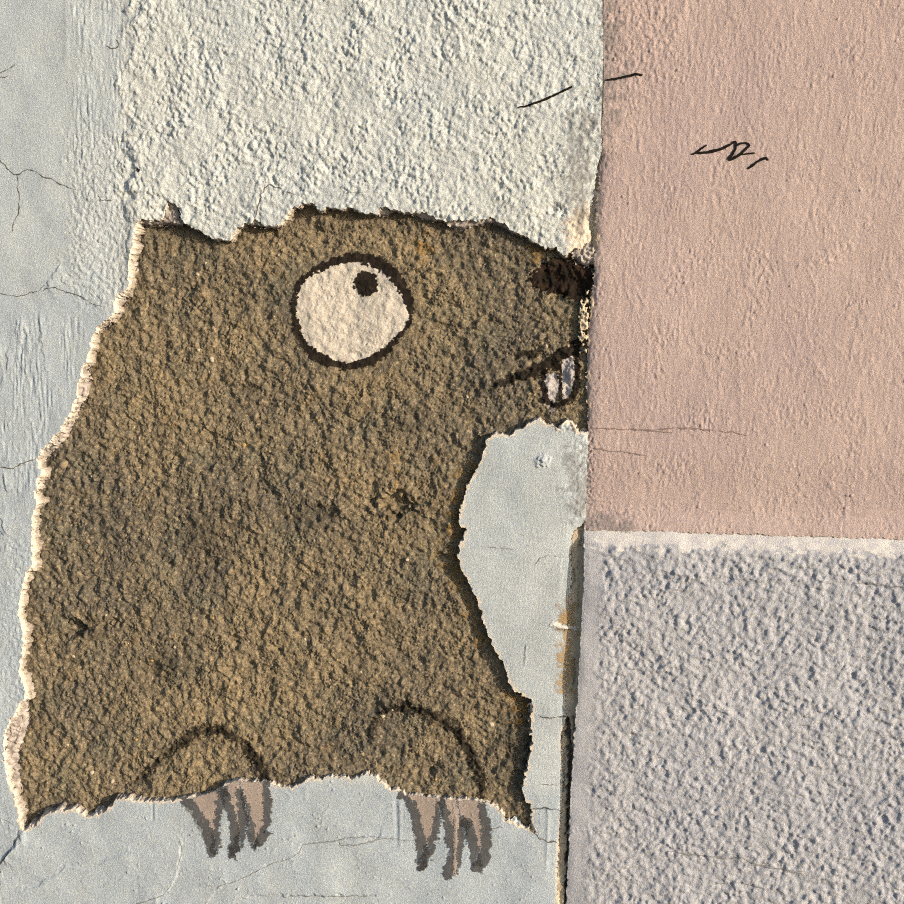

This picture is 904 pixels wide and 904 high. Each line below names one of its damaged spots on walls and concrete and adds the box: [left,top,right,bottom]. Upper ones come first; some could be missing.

crack [0,160,76,225]
spalling [2,201,595,833]
crack [205,836,443,904]